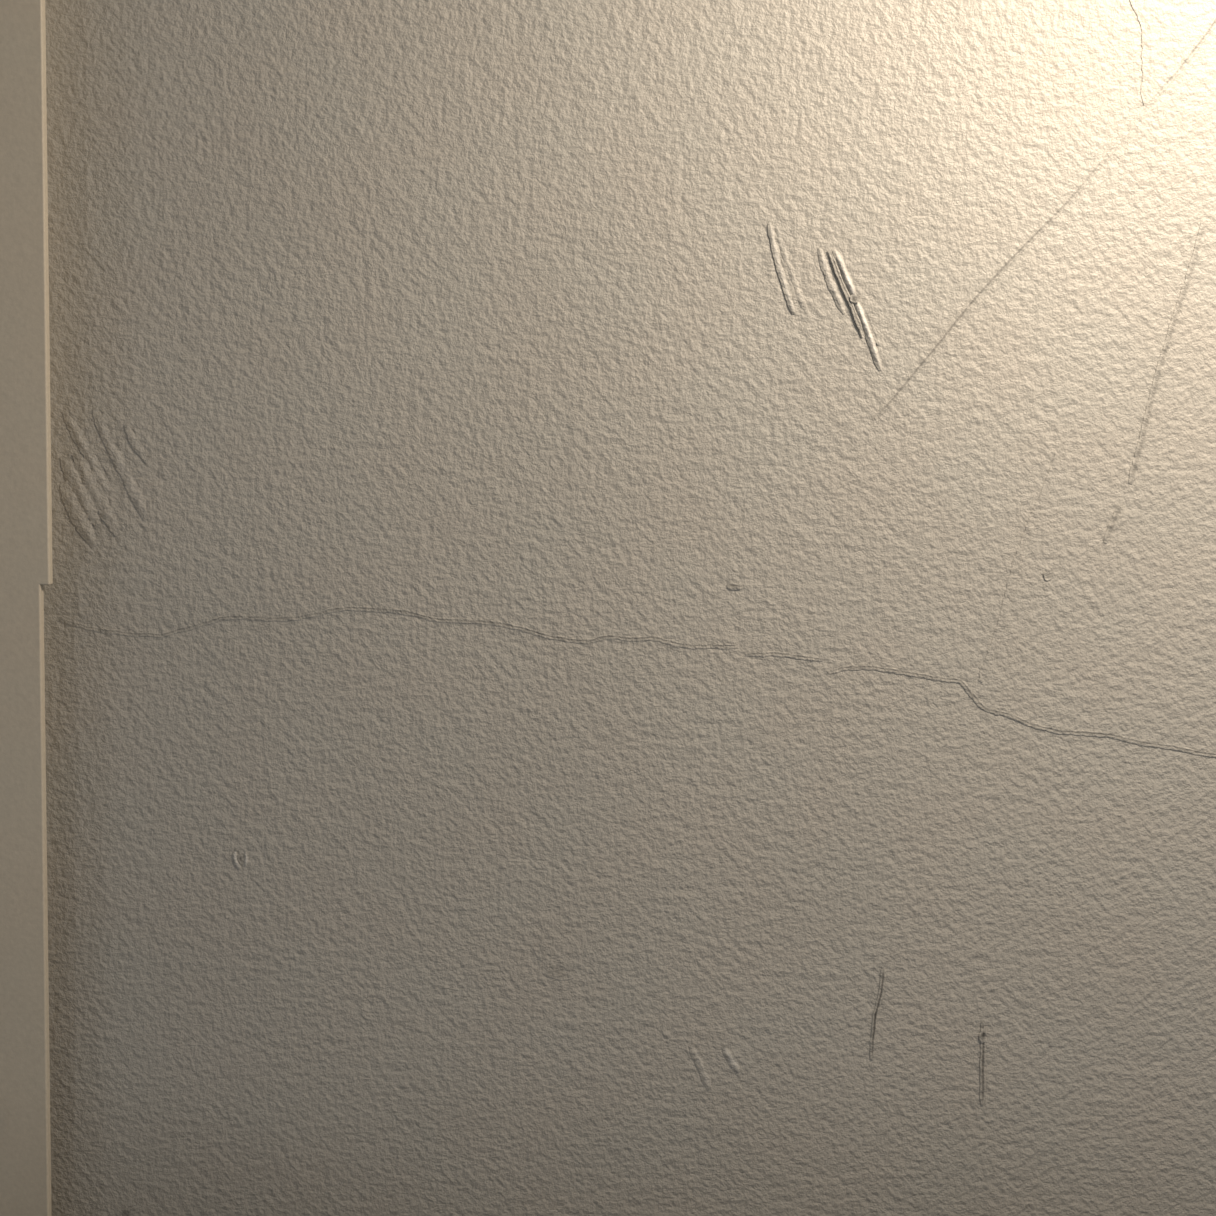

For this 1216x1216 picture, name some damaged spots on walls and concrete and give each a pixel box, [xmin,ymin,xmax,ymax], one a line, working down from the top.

crack [874,0,1216,419]
crack [1104,215,1209,543]
crack [57,606,1216,757]